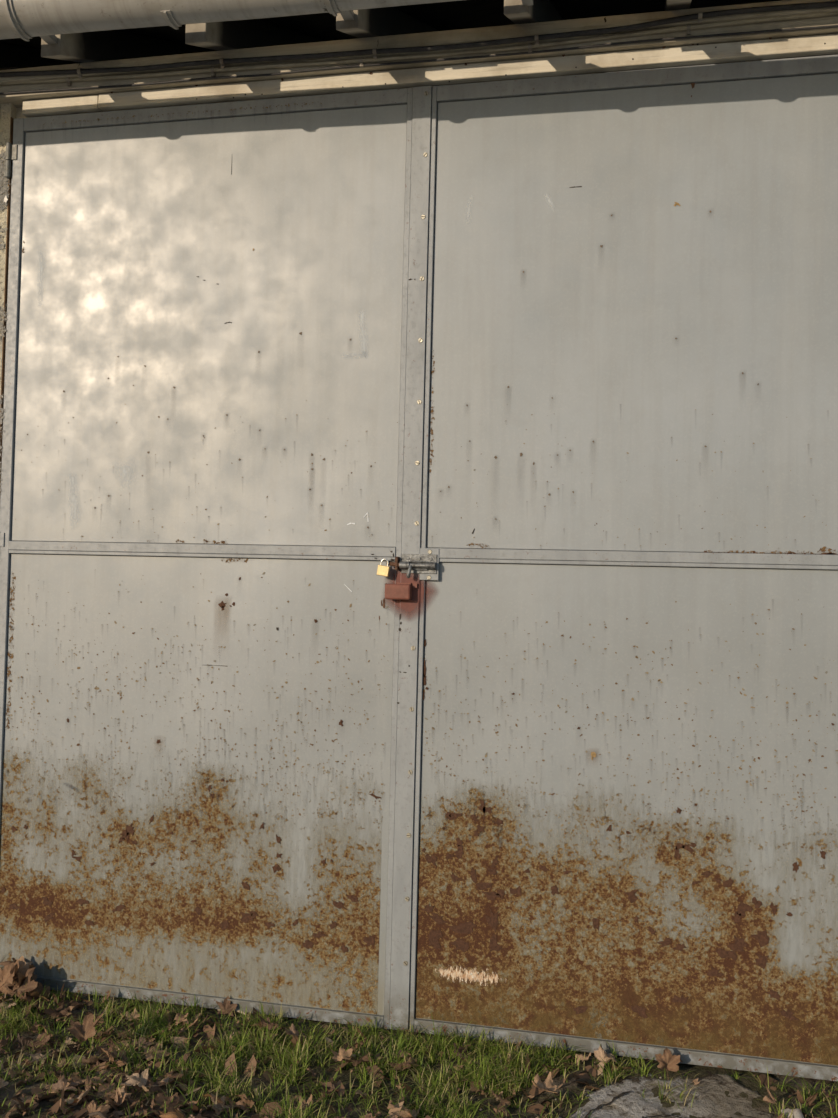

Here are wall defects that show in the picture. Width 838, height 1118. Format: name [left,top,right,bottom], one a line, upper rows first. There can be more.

corrosion [704,525,836,555]
corrosion [0,573,388,1014]
corrosion [416,609,838,1066]
crack [584,1091,682,1118]